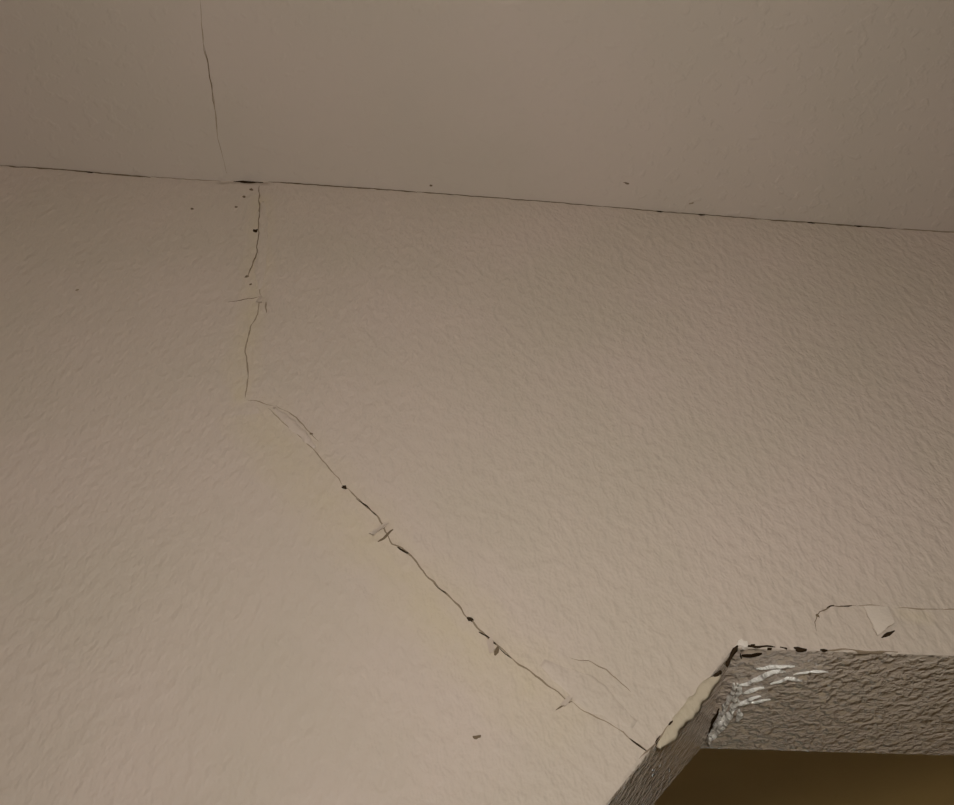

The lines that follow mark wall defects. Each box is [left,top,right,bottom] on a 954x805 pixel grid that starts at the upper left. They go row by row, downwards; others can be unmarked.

crack [200,3,227,173]
crack [0,165,954,751]